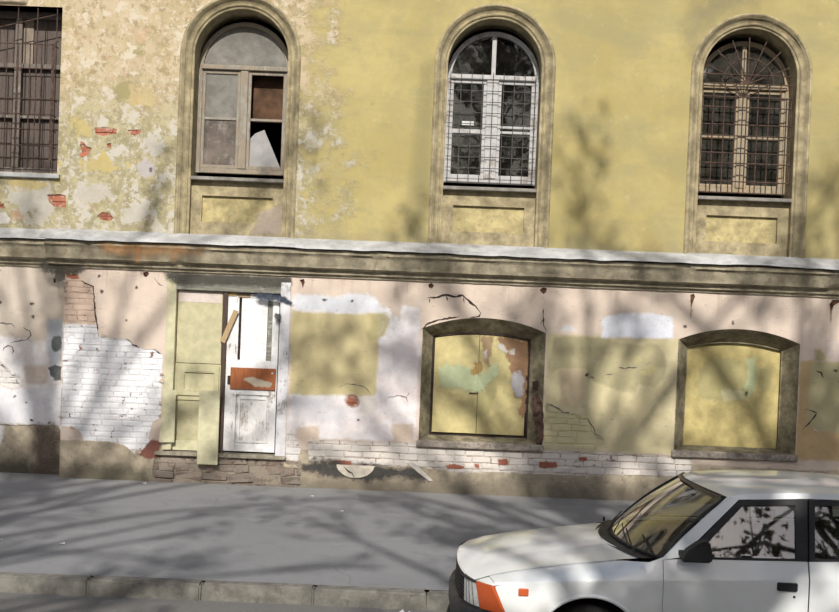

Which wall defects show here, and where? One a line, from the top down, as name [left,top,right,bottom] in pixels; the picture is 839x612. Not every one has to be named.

peeling [0,119,148,227]
crack [0,322,31,368]
flaking render [47,272,691,487]
crack [422,294,481,329]